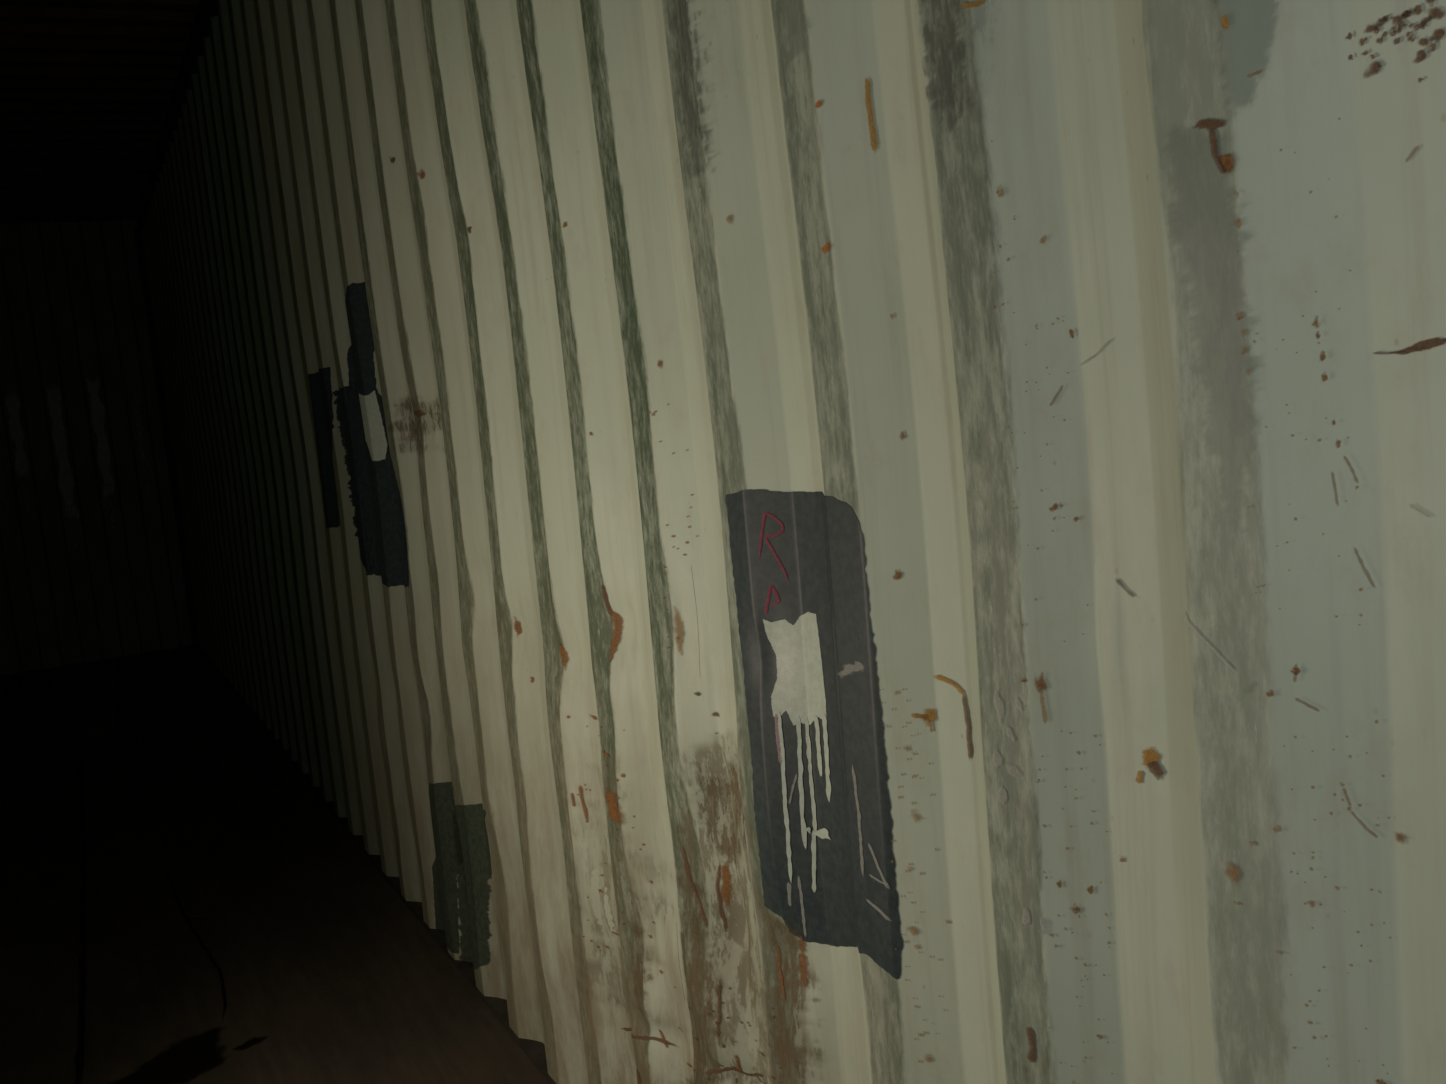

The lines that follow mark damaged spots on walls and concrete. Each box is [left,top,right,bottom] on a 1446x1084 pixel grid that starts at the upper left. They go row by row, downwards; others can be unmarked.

rust [601,585,622,661]
rust [571,715,634,841]
rust [674,765,817,1084]